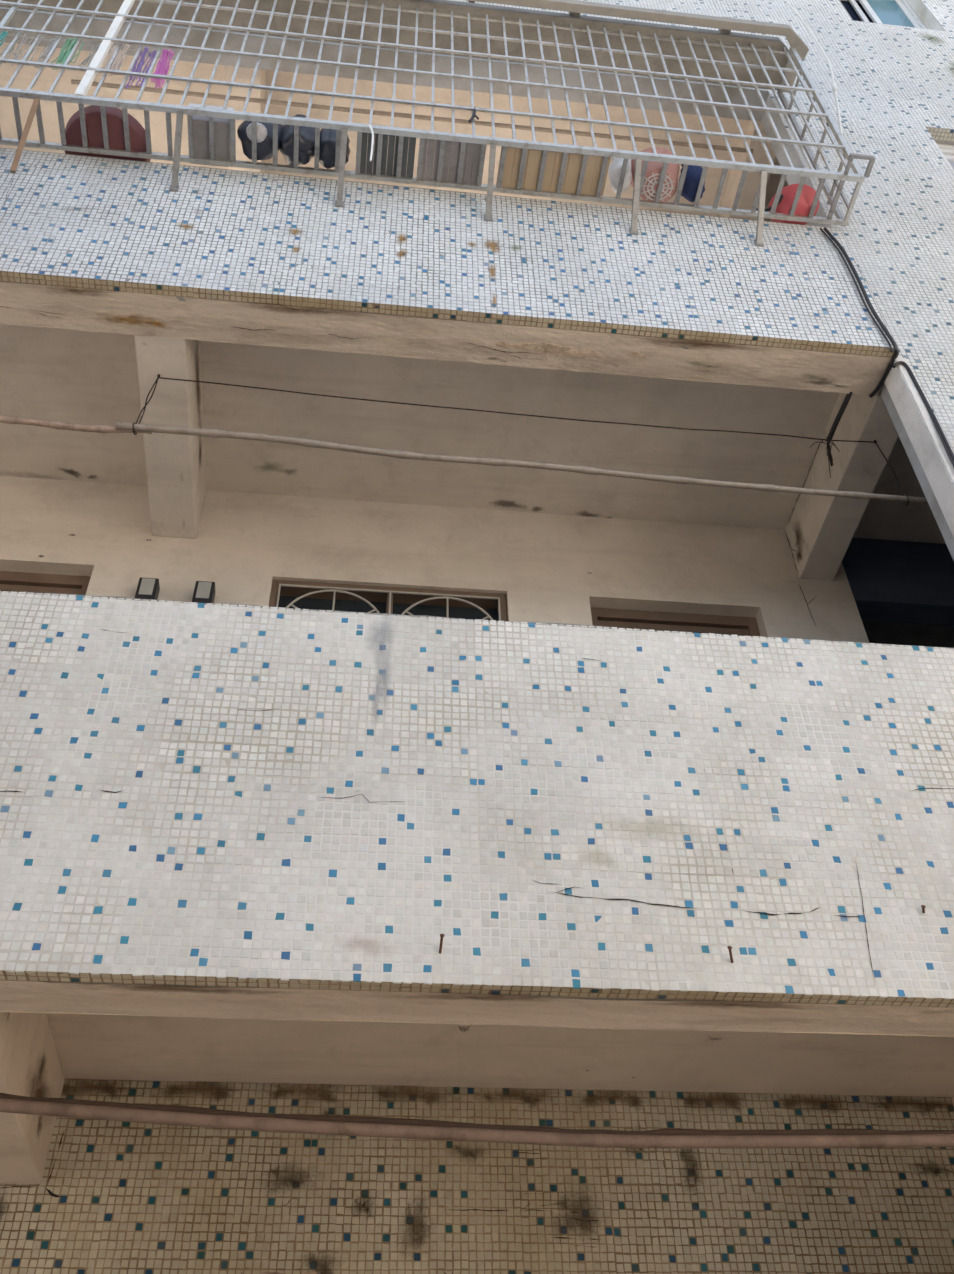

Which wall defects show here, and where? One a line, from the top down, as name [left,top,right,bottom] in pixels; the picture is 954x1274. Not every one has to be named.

crack [533,880,696,909]
crack [741,852,875,985]